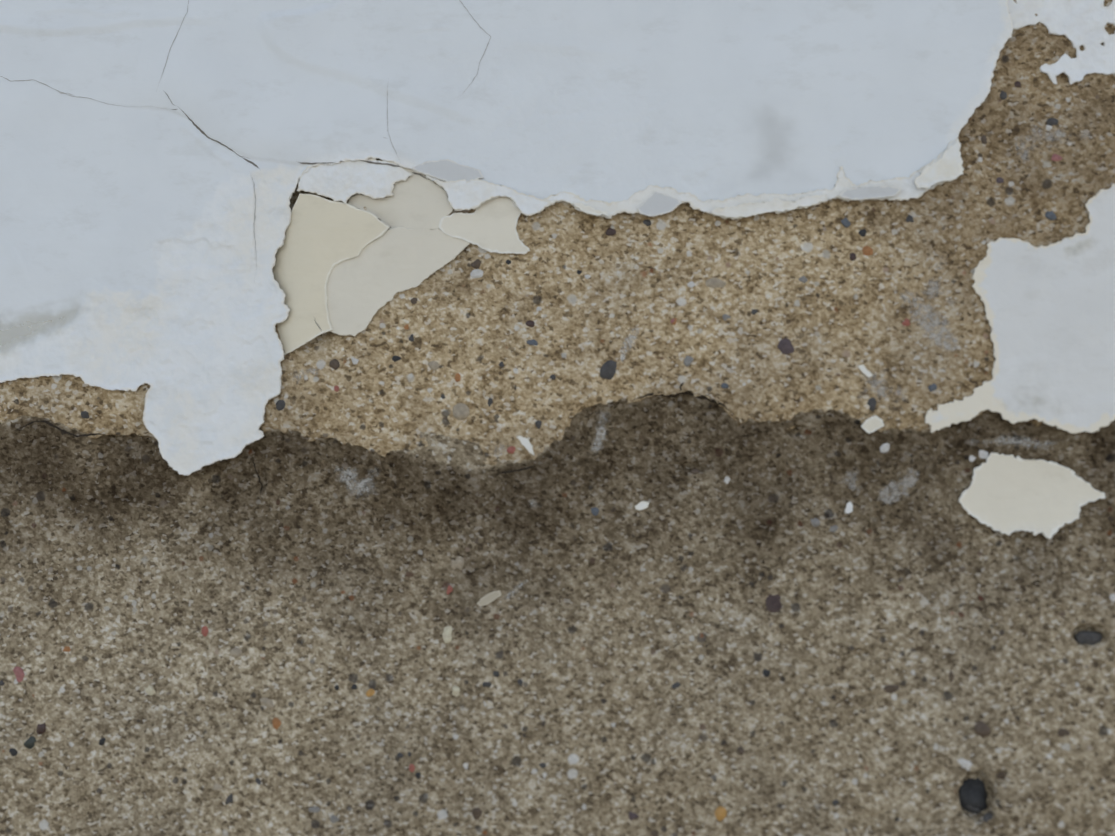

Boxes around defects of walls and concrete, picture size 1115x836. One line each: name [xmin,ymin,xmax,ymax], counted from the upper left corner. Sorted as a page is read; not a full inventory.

crack [0,76,126,107]
crack [158,1,258,265]
crack [296,79,427,179]
peeling [0,0,1115,476]
peeling [959,453,1105,539]